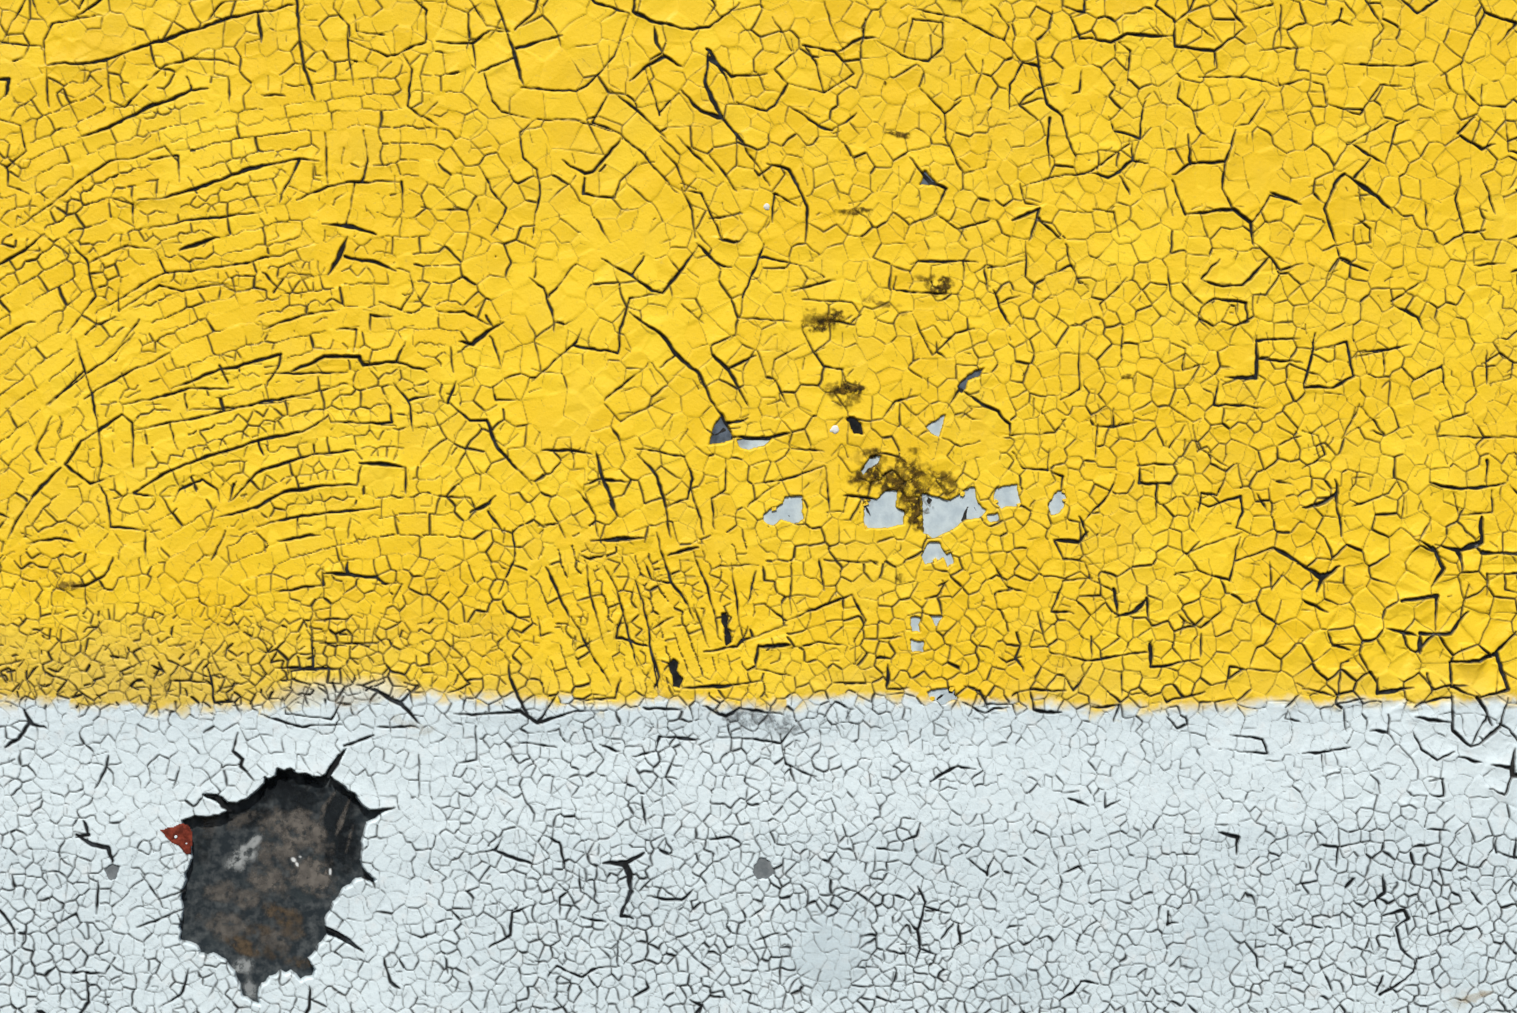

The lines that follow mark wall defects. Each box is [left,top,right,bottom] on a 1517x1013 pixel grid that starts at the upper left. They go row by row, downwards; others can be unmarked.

crack [1332,0,1438,25]
crack [1484,352,1514,380]
peeling [710,417,769,450]
spalling [846,417,863,435]
peeling [764,496,803,525]
peeling [863,490,904,530]
peeling [921,485,1021,566]
spalling [721,613,731,646]
crack [176,774,232,812]
spalling [160,761,382,1002]
crack [0,822,139,1013]
crack [325,927,397,987]